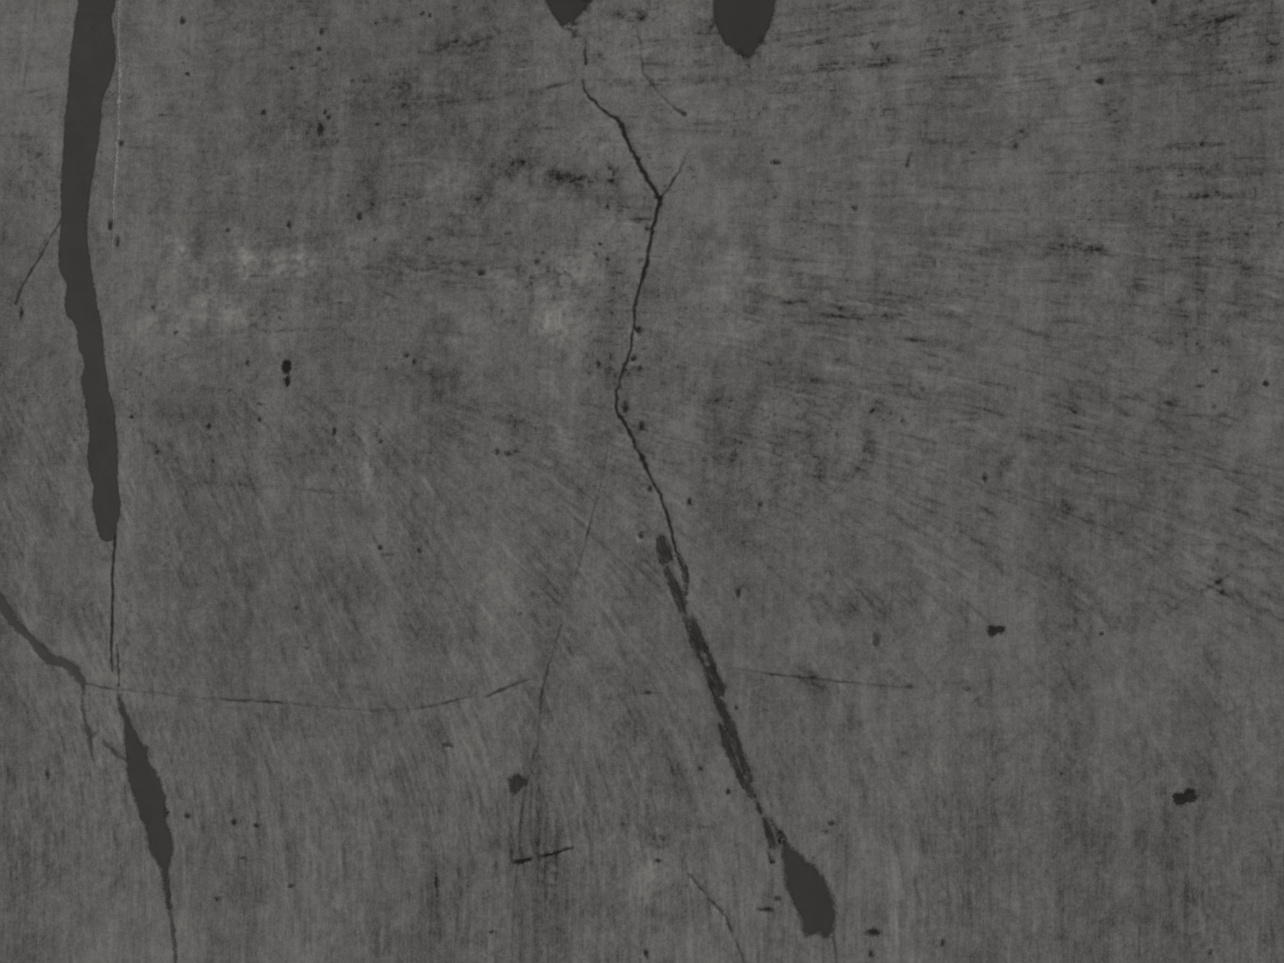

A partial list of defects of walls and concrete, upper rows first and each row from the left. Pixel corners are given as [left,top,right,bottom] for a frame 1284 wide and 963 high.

leakage [546,0,591,36]
leakage [710,0,775,57]
leakage [59,0,121,541]
crack [584,50,679,555]
crack [0,535,126,760]
leakage [118,696,173,909]
crack [165,880,177,963]
leakage [782,841,835,938]